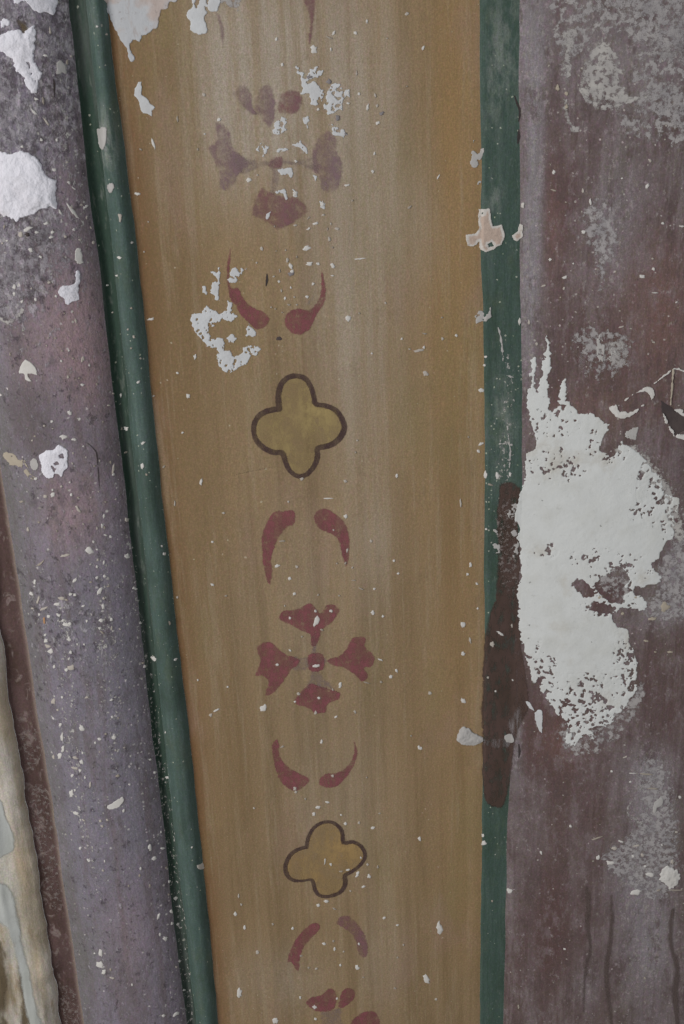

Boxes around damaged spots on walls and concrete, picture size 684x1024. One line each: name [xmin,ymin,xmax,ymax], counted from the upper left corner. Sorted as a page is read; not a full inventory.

peeling [96,0,177,62]
peeling [186,0,221,35]
peeling [273,117,287,135]
peeling [281,63,384,138]
flaking render [0,18,95,323]
peeling [256,140,308,200]
flaking render [466,208,523,252]
peeling [190,246,263,373]
peeling [270,245,335,313]
peeling [475,307,684,807]
flaking render [3,420,131,900]
peeling [132,586,193,1023]